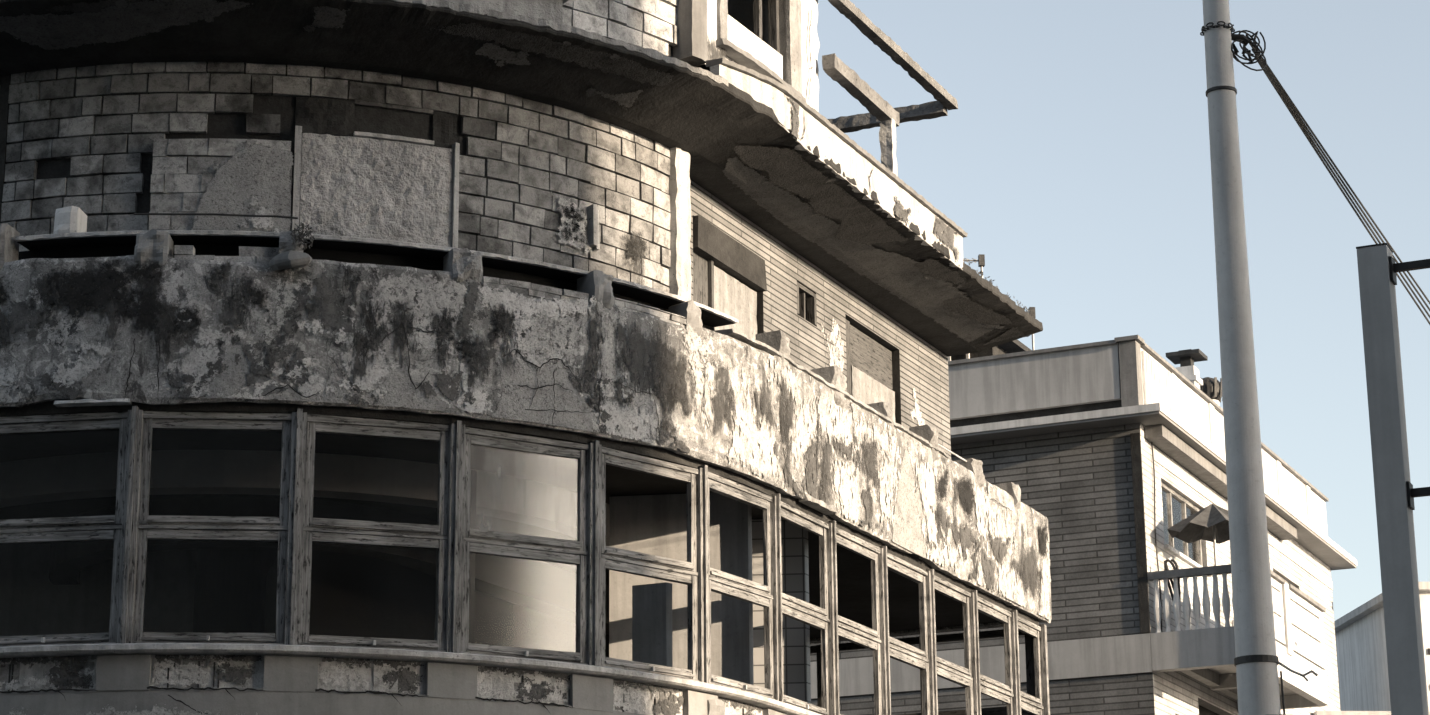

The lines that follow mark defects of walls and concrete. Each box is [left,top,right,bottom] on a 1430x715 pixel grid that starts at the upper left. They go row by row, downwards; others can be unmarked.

flaking render [722,96,1030,345]
peeling [0,273,132,407]
water stain [35,259,200,366]
water stain [340,265,417,383]
flaking render [158,263,690,453]
water stain [430,304,516,389]
crack [503,349,659,439]
water stain [578,305,796,482]
peeling [682,318,1051,621]
water stain [861,435,880,514]
water stain [935,470,975,527]
water stain [1013,526,1048,604]